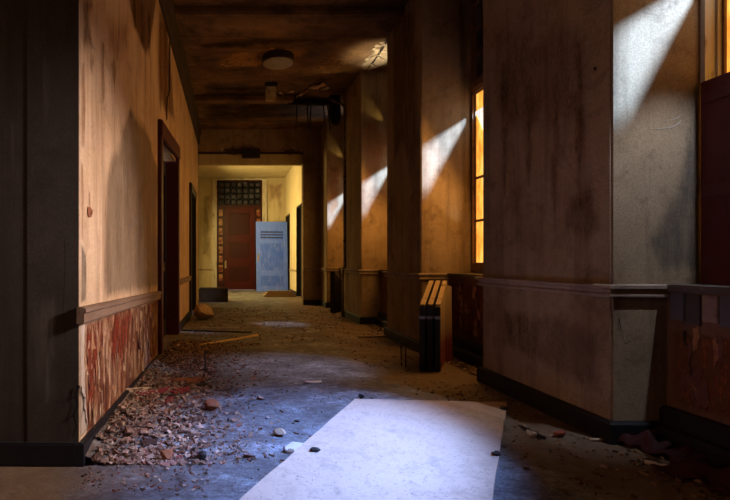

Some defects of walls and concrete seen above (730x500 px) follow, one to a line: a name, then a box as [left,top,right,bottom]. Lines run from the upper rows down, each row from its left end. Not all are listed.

peeling [362,41,387,71]
peeling [81,300,157,435]
crack [65,385,88,437]